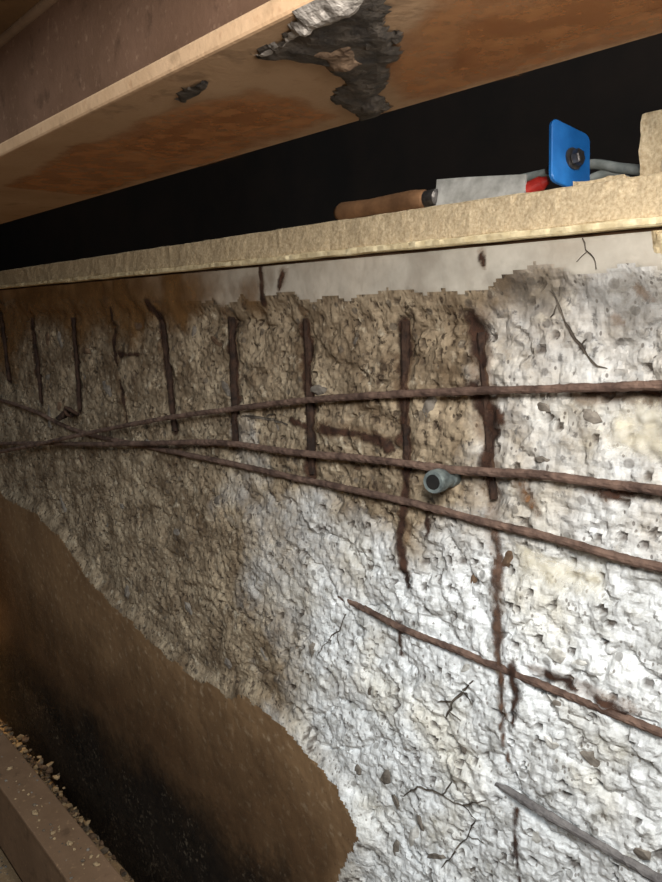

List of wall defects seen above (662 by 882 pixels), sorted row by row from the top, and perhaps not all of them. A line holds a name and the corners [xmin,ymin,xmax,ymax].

peeling [252,0,405,121]
rust [465,311,490,368]
crack [550,287,607,369]
rust [289,320,412,589]
rust [462,380,505,494]
rust [598,480,657,499]
spalling [0,261,662,882]
rust [491,529,519,763]
rust [544,670,579,691]
damp [0,645,267,882]
crack [400,781,486,868]
rust [513,807,521,882]